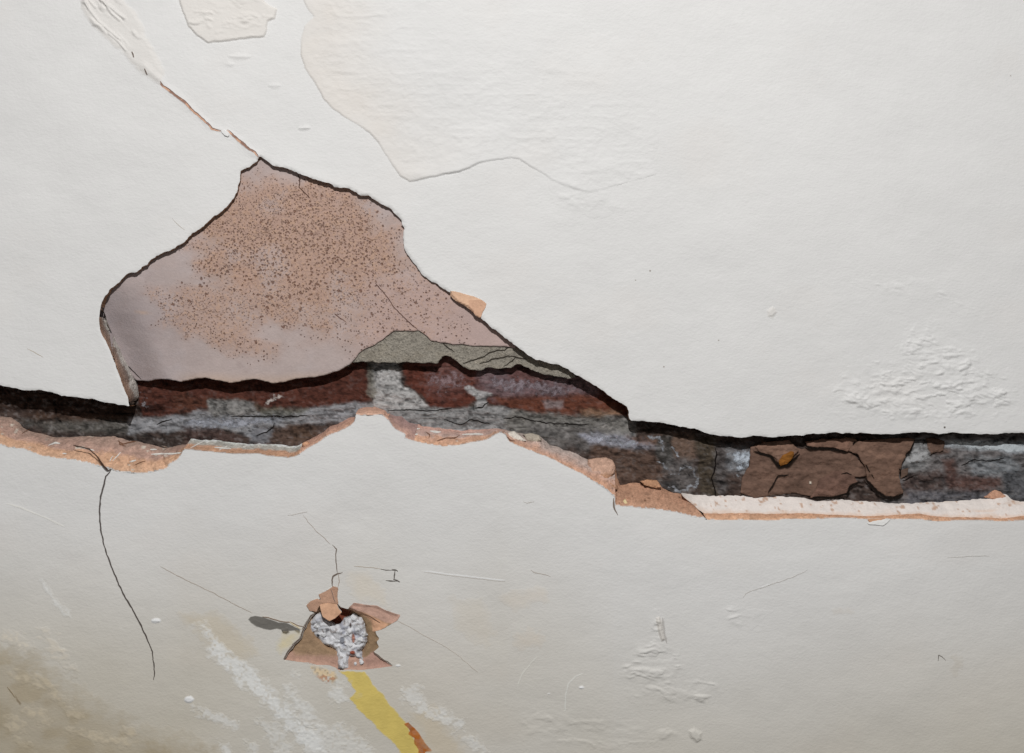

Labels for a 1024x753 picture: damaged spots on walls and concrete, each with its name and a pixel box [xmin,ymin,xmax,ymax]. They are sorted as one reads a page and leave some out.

peeling [178,0,278,44]
flaking render [99,157,630,420]
crack [0,356,1024,680]
flaking render [284,592,400,670]
rust [404,722,426,753]